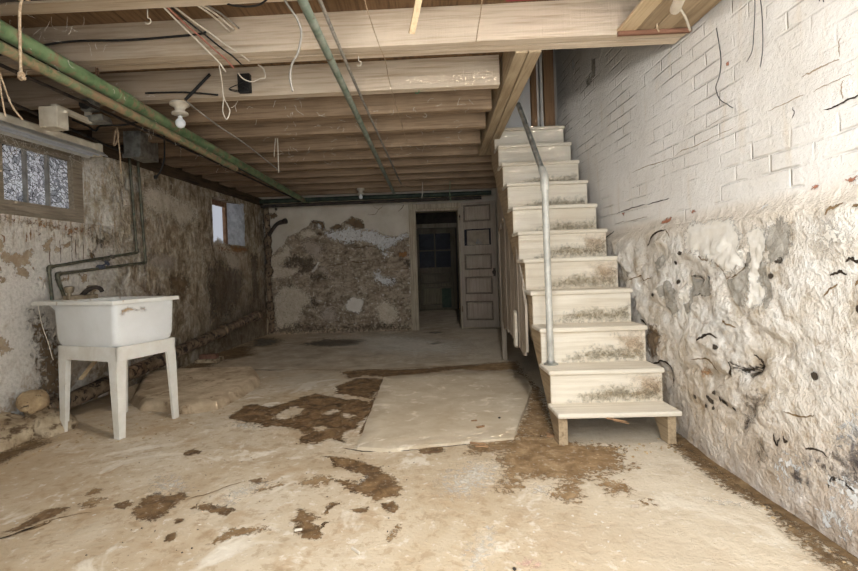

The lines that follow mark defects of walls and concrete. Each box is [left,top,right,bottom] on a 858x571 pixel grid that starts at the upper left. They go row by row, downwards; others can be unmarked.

peeling [0,234,71,283]
leakage [152,272,192,298]
leakage [206,252,266,324]
flaking render [271,216,412,331]
peeling [651,216,793,315]
peeling [813,220,853,253]
peeling [0,336,14,356]
crack [691,320,735,369]
leakage [229,323,483,445]